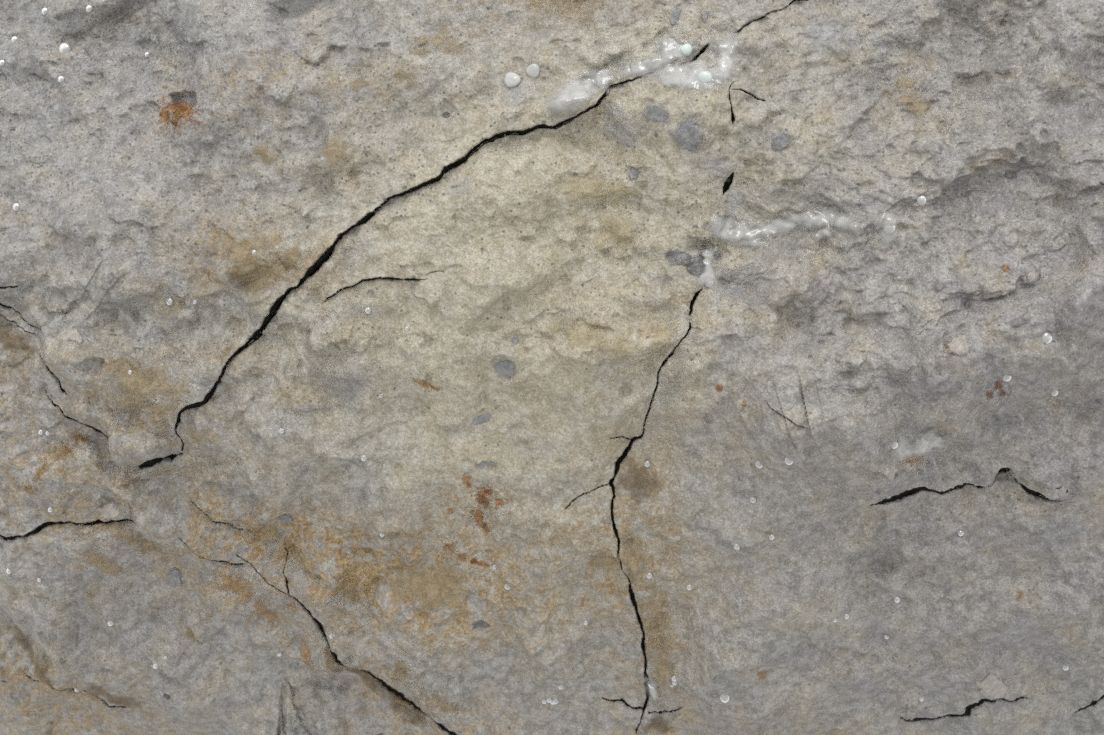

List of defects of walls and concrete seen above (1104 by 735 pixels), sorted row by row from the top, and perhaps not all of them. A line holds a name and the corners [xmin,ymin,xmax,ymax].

crack [731,0,808,33]
crack [689,45,708,63]
leakage [548,38,736,114]
corrosion [151,98,199,127]
crack [729,82,765,125]
crack [723,173,734,195]
crack [139,73,650,469]
crack [0,286,104,434]
crack [1,519,133,541]
crack [566,289,702,733]
crack [179,502,457,735]